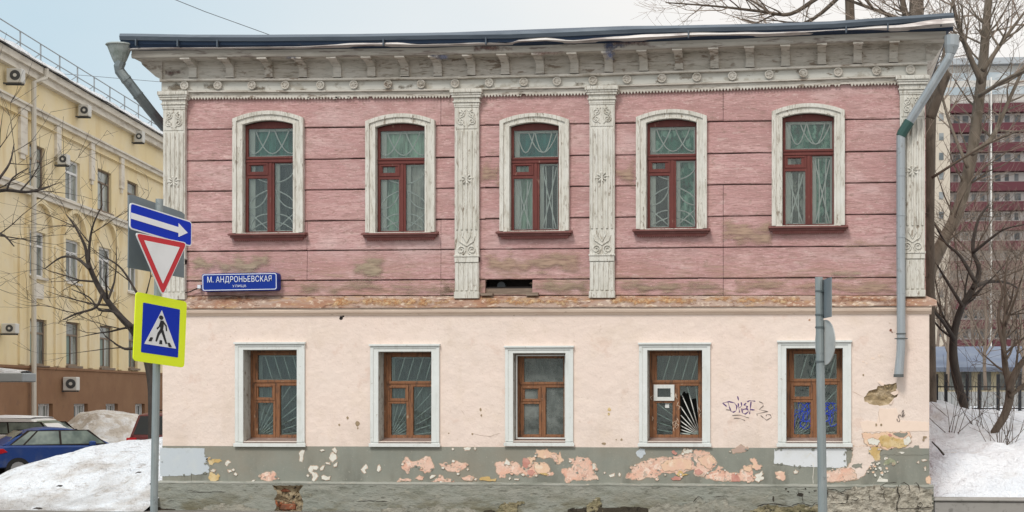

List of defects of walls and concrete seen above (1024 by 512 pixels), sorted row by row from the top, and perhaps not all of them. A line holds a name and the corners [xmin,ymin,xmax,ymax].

flaking render [864,382,898,406]
peeling [204,455,238,481]
flaking render [252,447,338,511]
flaking render [381,424,933,512]